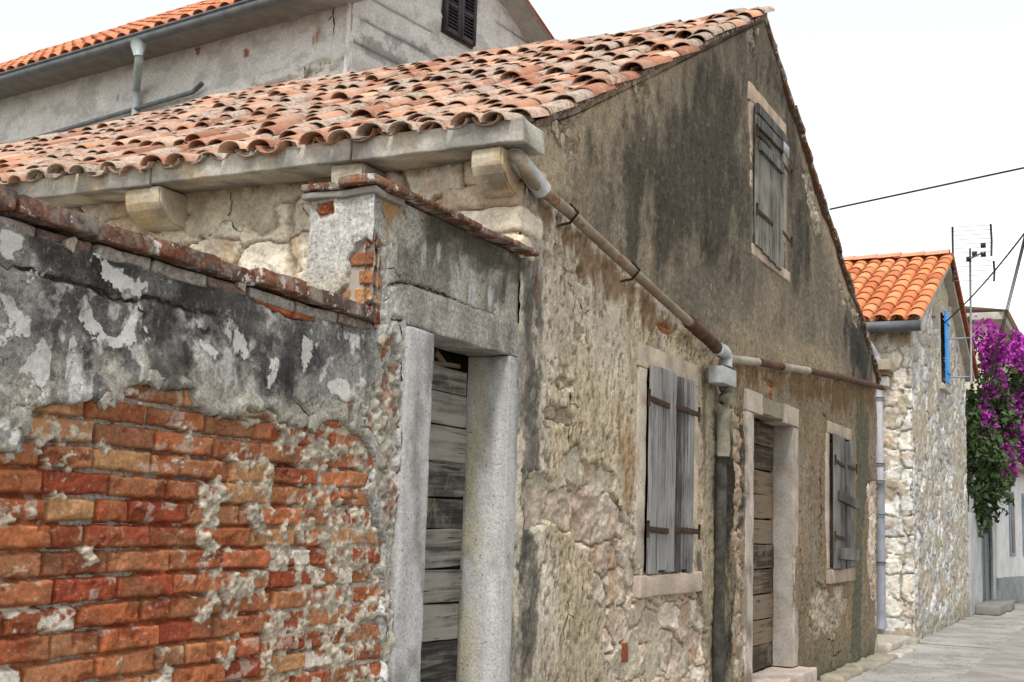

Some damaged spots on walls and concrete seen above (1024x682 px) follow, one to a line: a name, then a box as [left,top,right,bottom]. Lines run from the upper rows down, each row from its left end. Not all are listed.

flaking render [0,228,403,682]
leakage [520,256,544,486]
corrosion [538,197,690,342]
leakage [619,56,751,271]
leakage [520,517,540,673]